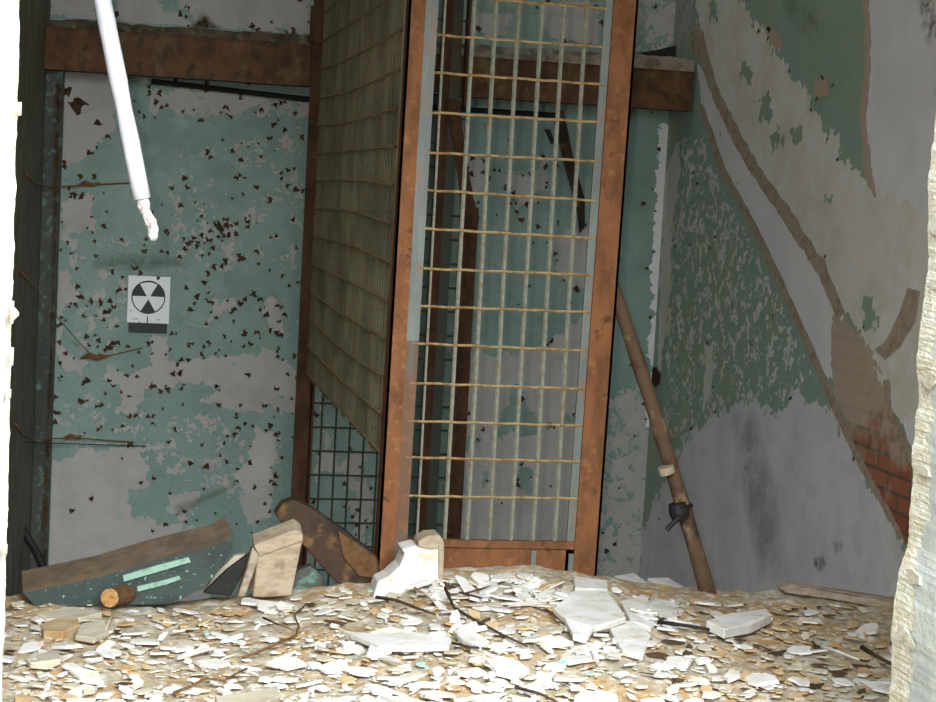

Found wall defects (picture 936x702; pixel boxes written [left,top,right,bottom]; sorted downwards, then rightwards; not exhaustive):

peeling [50,0,97,20]
peeling [114,0,313,34]
peeling [49,71,309,565]
peeling [635,0,936,702]
peeling [311,398,374,546]
peeling [597,384,698,588]